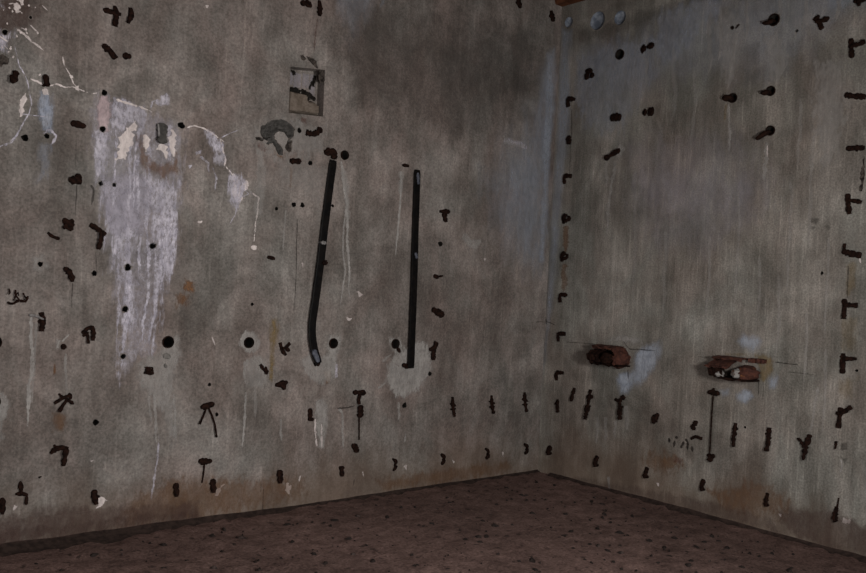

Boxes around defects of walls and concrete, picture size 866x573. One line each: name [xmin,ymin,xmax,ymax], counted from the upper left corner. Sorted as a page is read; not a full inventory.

crack [0,49,96,147]
crack [187,125,249,221]
leakage [92,94,181,355]